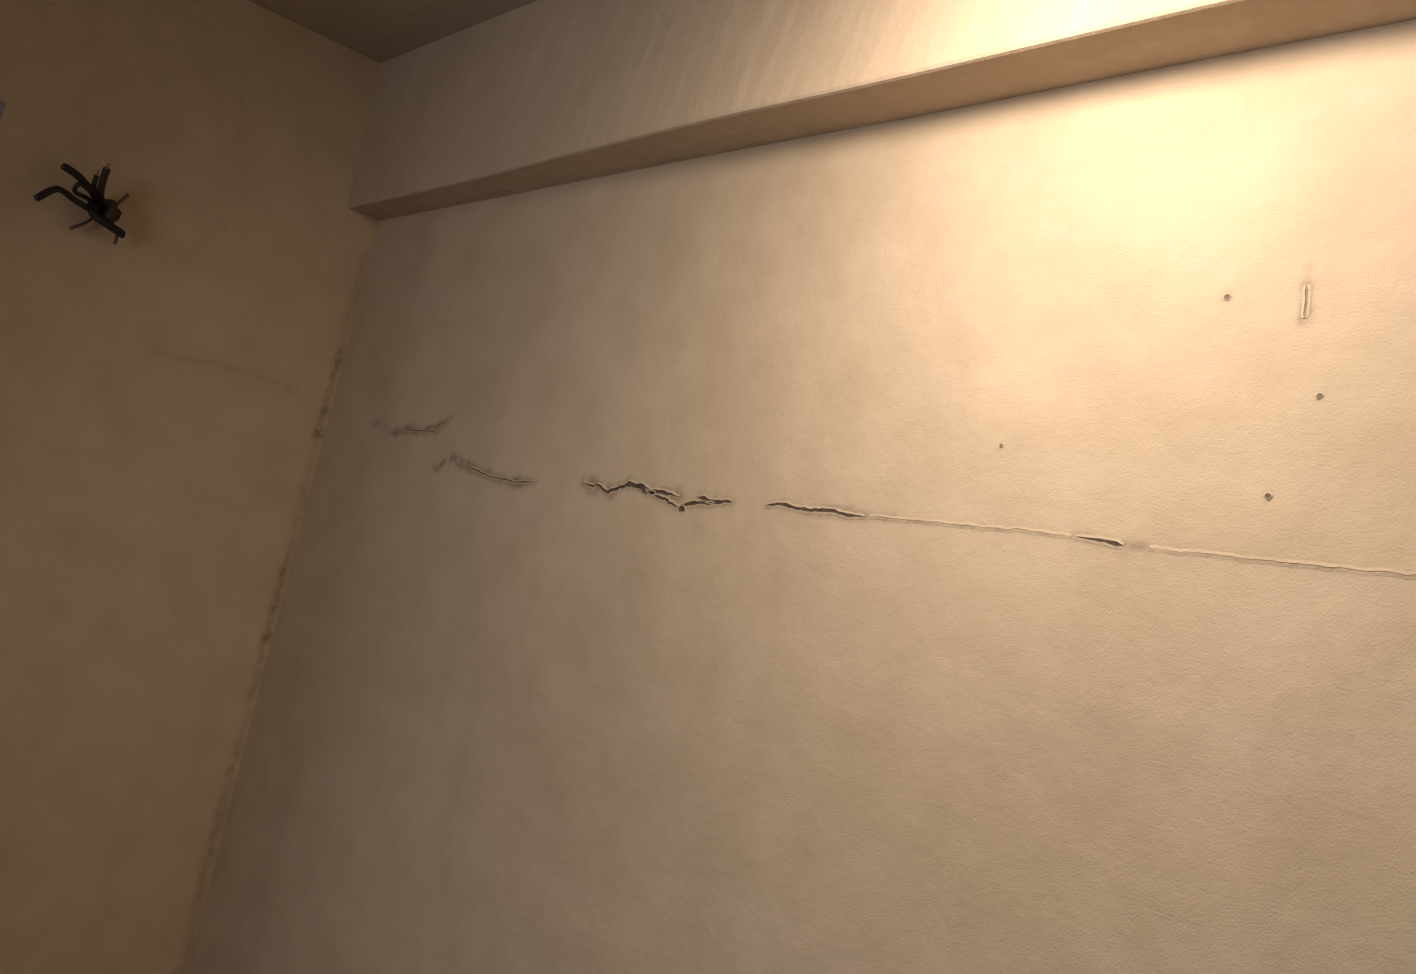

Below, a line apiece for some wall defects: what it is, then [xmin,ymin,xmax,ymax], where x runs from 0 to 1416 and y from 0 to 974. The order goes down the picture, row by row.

crack [406,417,452,434]
crack [461,462,535,485]
crack [583,479,1416,580]